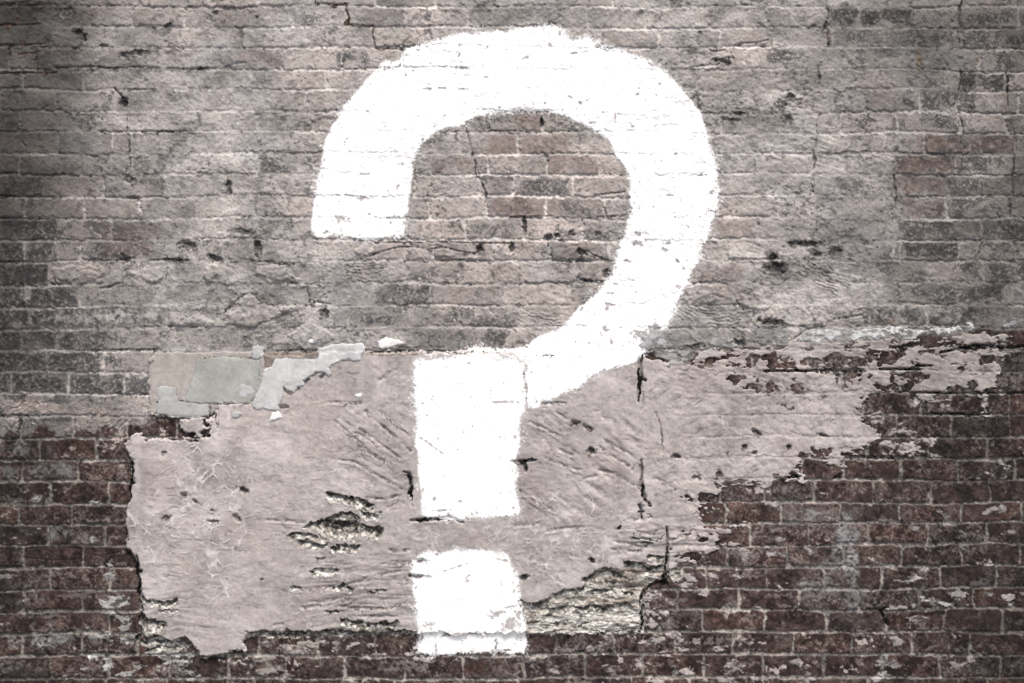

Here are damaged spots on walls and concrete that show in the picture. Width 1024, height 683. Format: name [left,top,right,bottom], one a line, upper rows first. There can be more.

peeling [763,240,844,275]
peeling [252,337,418,421]
crack [370,347,497,355]
crack [637,345,705,446]
peeling [638,317,974,365]
flaking render [871,410,941,459]
spalling [285,491,389,595]
crack [276,464,690,633]
spalling [518,525,746,683]
flaking render [898,589,967,622]
spalling [230,610,417,682]
flaking render [869,636,903,682]